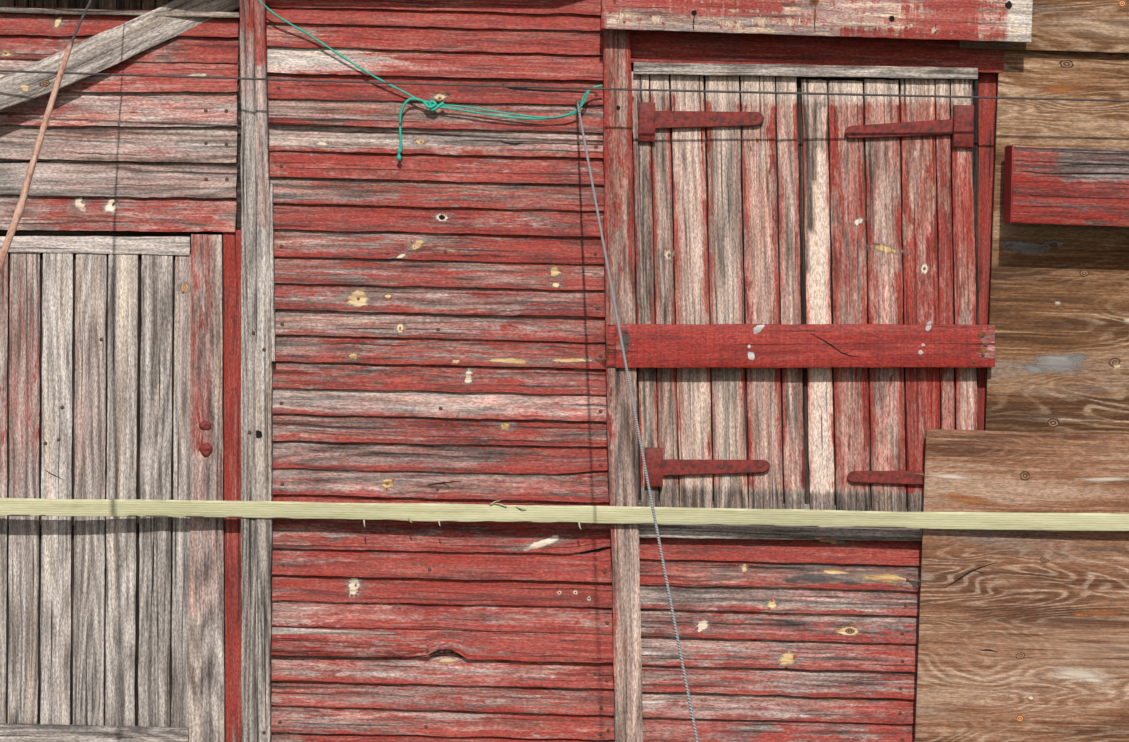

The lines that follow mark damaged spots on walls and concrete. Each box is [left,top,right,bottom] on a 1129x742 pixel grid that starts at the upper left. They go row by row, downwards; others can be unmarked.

peeling [72,197,120,213]
peeling [342,289,395,310]
peeling [748,322,766,360]
peeling [452,360,475,384]
peeling [518,535,568,551]
crack [580,546,611,554]
peeling [823,569,913,584]
crack [944,562,996,588]
peeling [348,578,364,599]
peeling [694,617,709,635]
crack [393,649,461,658]
peeling [775,650,797,669]